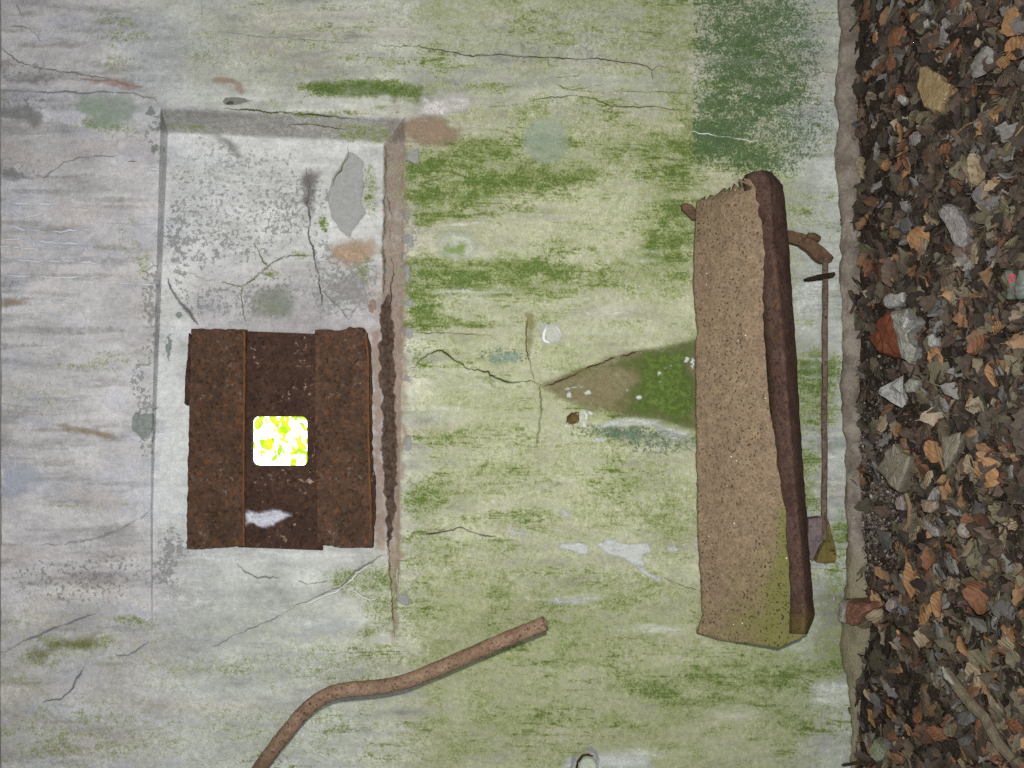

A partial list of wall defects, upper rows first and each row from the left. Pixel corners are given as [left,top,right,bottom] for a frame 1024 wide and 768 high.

crack [1,5,159,104]
crack [230,32,757,142]
crack [168,108,359,325]
spalling [328,152,366,237]
rust [333,148,406,552]
crack [409,315,648,444]
crack [2,613,96,653]
crack [215,554,398,646]
peeling [558,538,661,582]